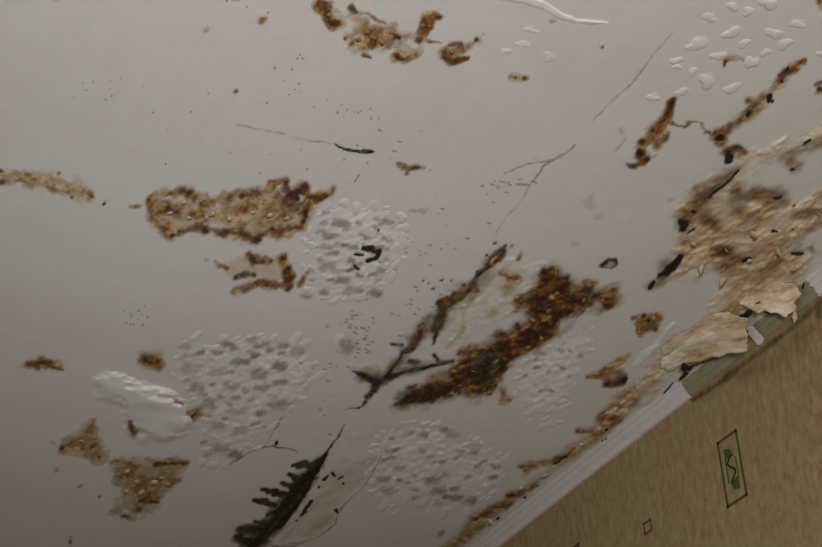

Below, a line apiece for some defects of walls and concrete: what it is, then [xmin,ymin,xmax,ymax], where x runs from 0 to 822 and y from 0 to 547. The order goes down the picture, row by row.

rust [311,0,478,66]
rust [626,58,807,169]
rust [723,54,745,67]
rust [0,169,106,205]
rust [128,177,335,294]
peeling [648,114,822,322]
crack [326,325,435,453]
rust [394,266,620,406]
water stain [252,460,317,524]